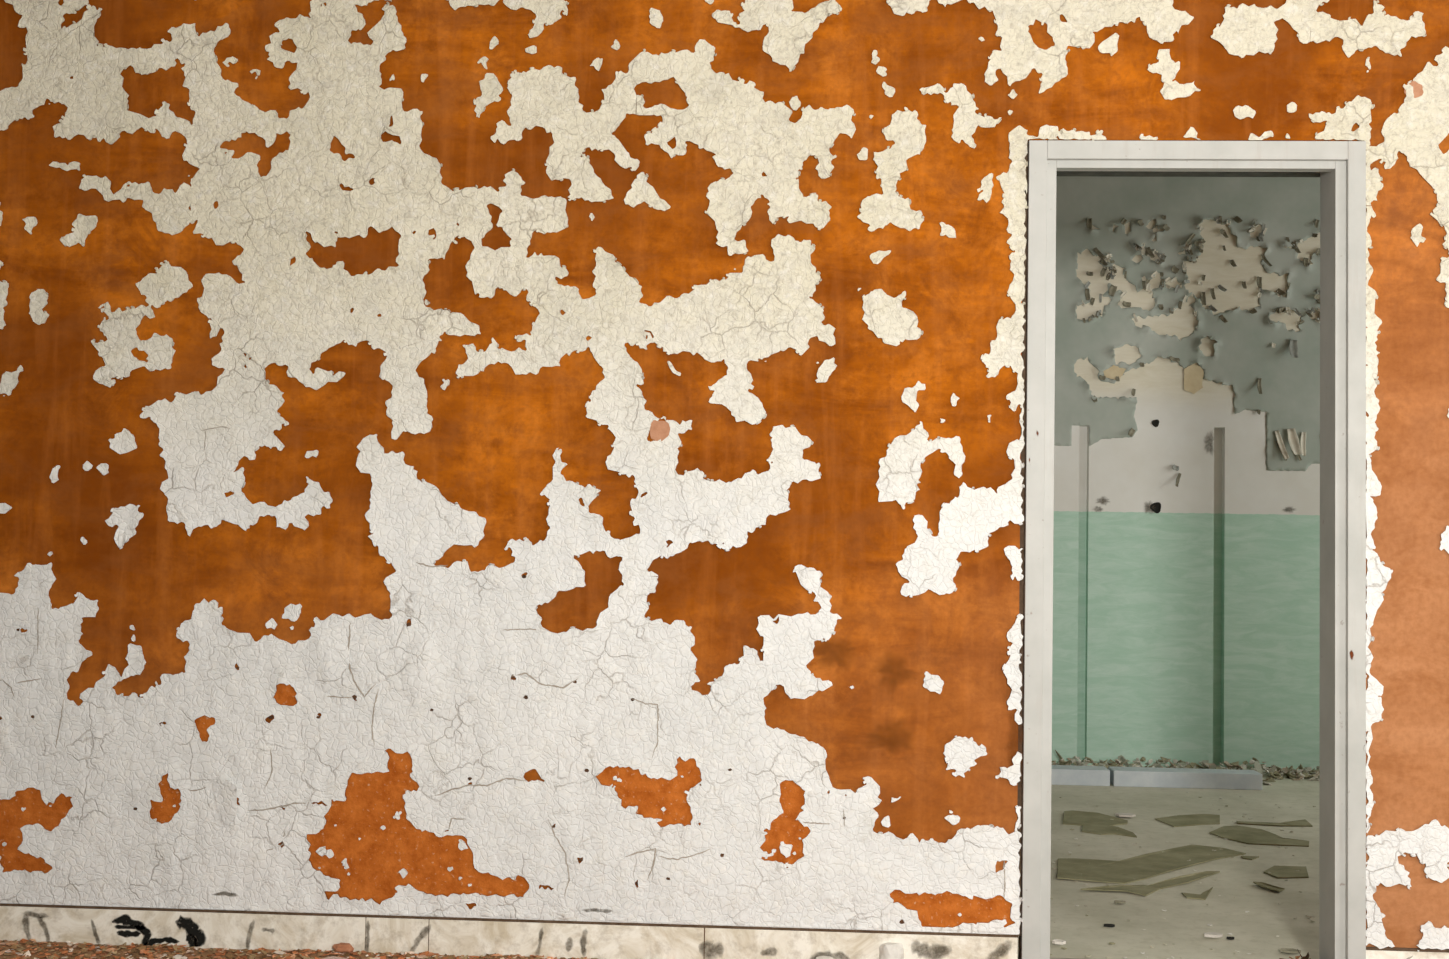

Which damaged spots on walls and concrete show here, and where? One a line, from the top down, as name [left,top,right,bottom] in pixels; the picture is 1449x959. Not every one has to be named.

peeling [1211,0,1426,73]
peeling [1233,105,1290,140]
peeling [876,0,1201,598]
peeling [1054,176,1320,471]
peeling [0,0,1024,935]
peeling [1287,46,1449,952]
crack [0,610,64,748]
crack [327,623,378,745]
crack [248,750,305,851]
crack [434,778,526,831]